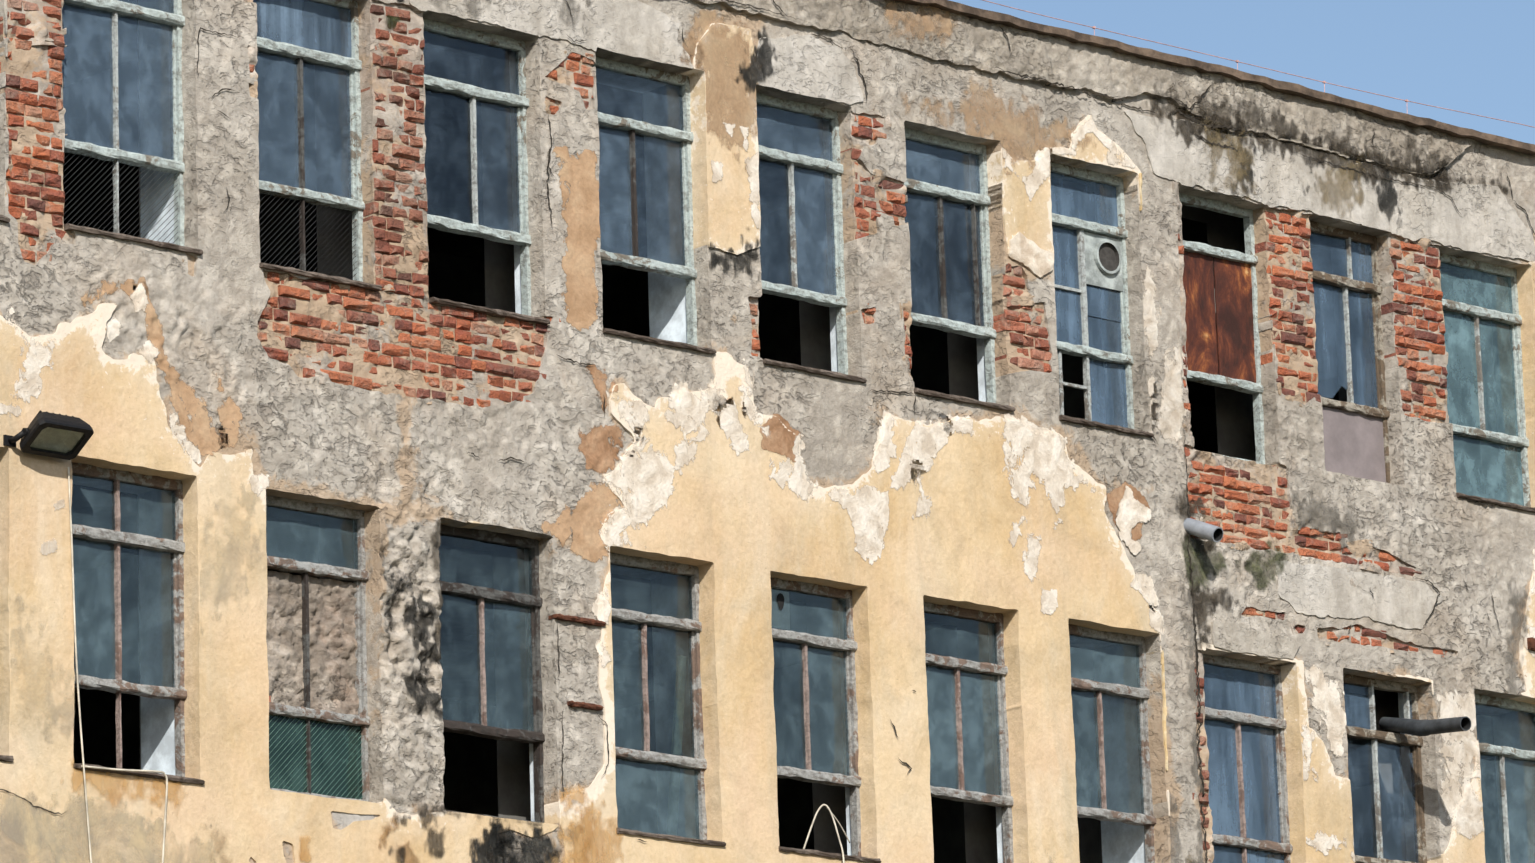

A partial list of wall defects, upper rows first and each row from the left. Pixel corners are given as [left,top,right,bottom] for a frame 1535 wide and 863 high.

crack [991,26,1241,151]
peeling [723,122,761,229]
peeling [1008,118,1135,201]
leakage [1150,86,1508,221]
crack [1297,129,1462,217]
crack [1506,172,1535,234]
peeling [1008,232,1054,278]
spalling [1124,110,1535,423]
peeling [1155,345,1188,442]
peeling [1116,486,1151,555]
peeling [1192,344,1535,863]
leakage [470,817,562,863]